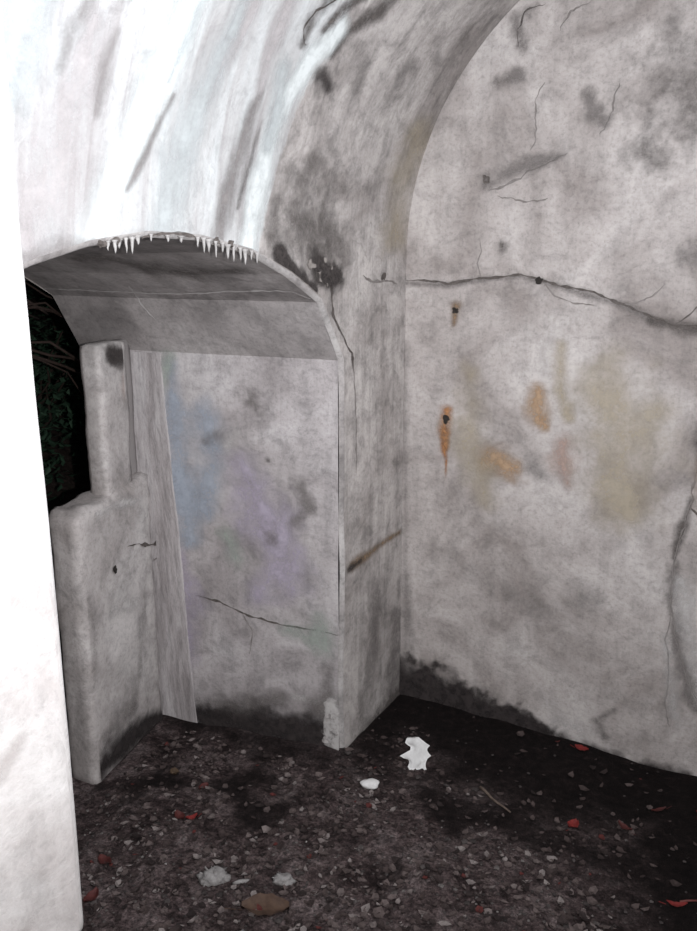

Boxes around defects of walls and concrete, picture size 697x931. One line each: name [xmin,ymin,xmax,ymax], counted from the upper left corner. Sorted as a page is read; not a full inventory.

water stain [30,0,207,278]
crack [363,243,697,332]
crack [330,288,358,469]
rust [440,407,452,471]
rust [348,531,400,572]
crack [196,595,335,654]
water stain [360,611,569,740]